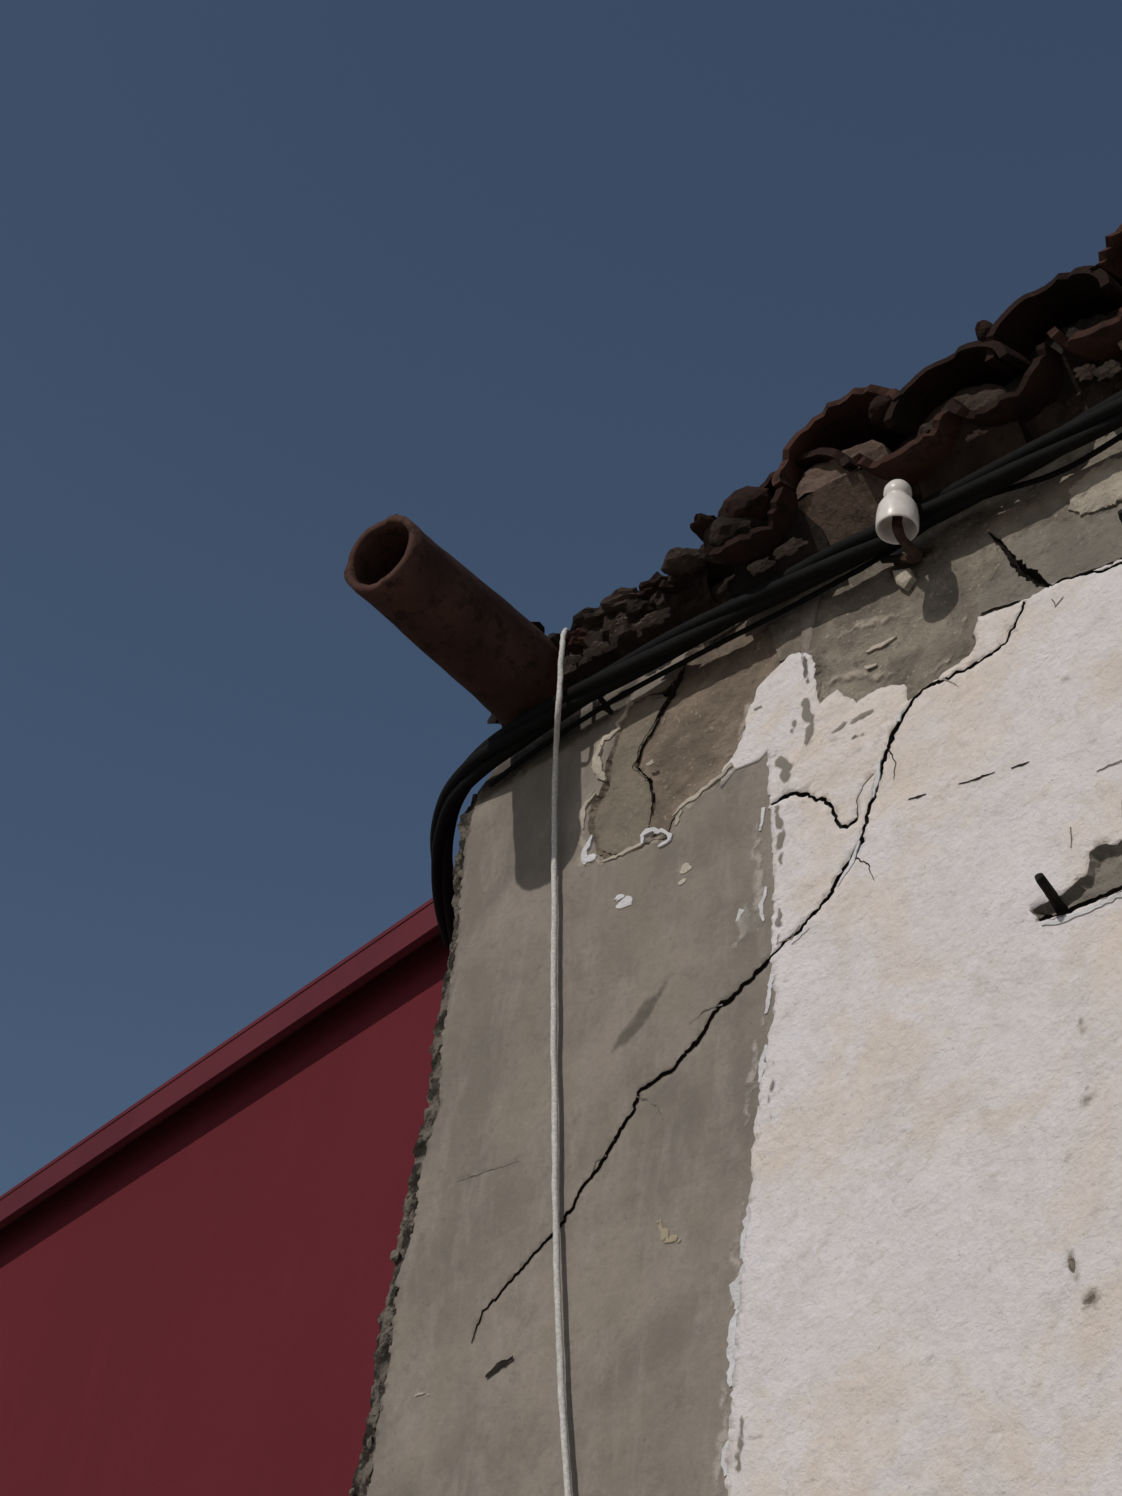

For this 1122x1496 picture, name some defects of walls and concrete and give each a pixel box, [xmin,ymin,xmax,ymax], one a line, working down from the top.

peeling [735,805,785,946]
spalling [1030,840,1122,926]
peeling [762,972,775,1025]
crack [471,532,1122,1378]
spalling [349,794,478,1496]
peeling [745,1043,774,1116]
peeling [714,1202,750,1485]